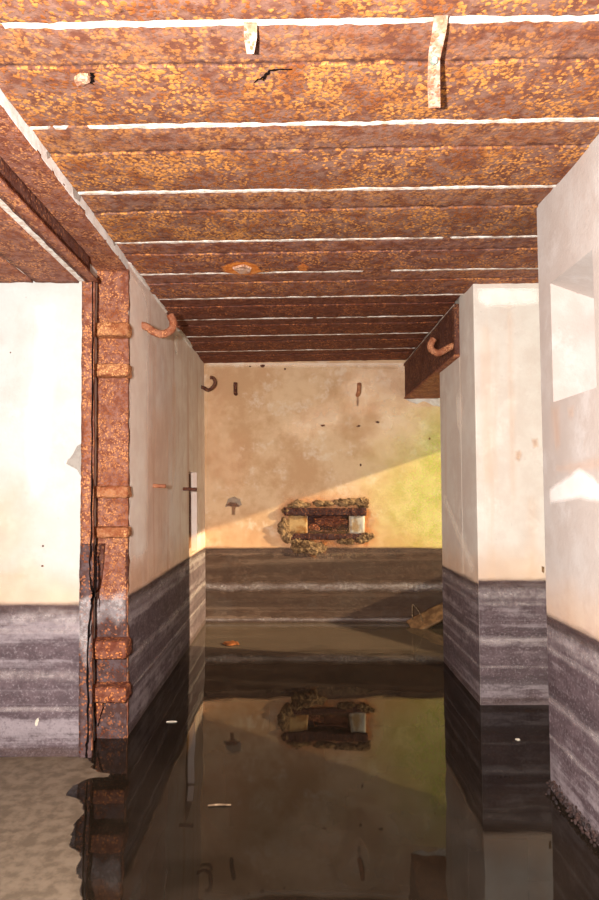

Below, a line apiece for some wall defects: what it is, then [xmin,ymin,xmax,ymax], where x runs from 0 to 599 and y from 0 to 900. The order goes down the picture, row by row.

corrosion [74,72,95,86]
crack [254,68,292,83]
corrosion [222,262,262,275]
crack [85,281,98,758]
corrosion [95,543,105,592]